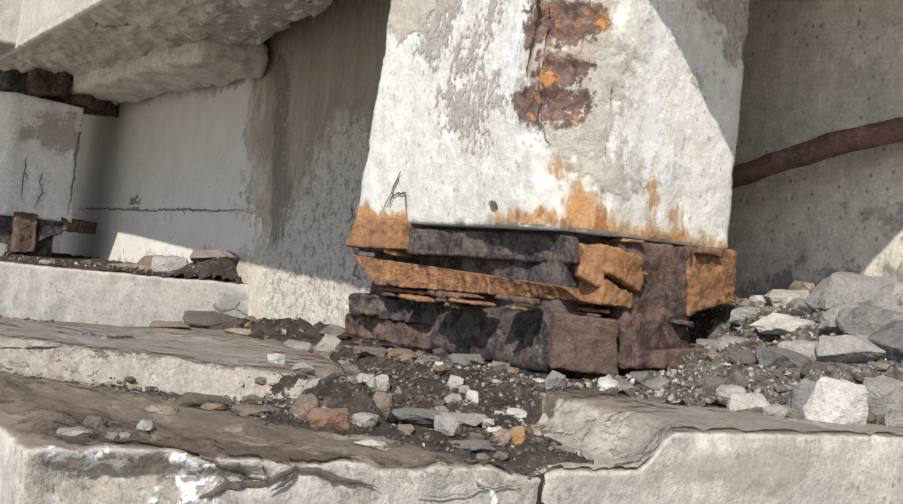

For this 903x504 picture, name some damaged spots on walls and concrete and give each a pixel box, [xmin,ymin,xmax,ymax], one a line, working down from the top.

peeling [387,0,508,159]
crack [526,0,542,73]
rust [510,0,613,129]
crack [21,156,45,207]
crack [67,131,251,215]
rust [384,249,439,258]
rust [487,177,728,258]
rust [385,280,542,311]
spalling [0,337,322,408]
spalling [19,432,244,504]
crack [196,453,379,499]
crack [416,462,545,504]